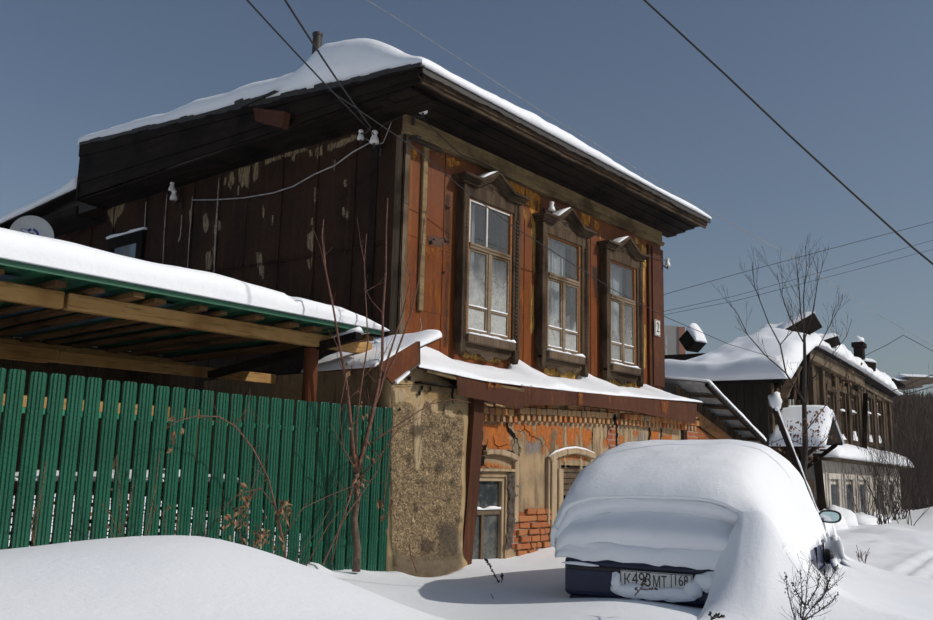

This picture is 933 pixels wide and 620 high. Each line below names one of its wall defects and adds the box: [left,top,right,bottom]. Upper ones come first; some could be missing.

peeling [224,135,356,195]
peeling [107,203,125,228]
peeling [203,213,221,234]
peeling [482,422,592,463]
spalling [603,427,639,449]
spalling [482,462,552,556]